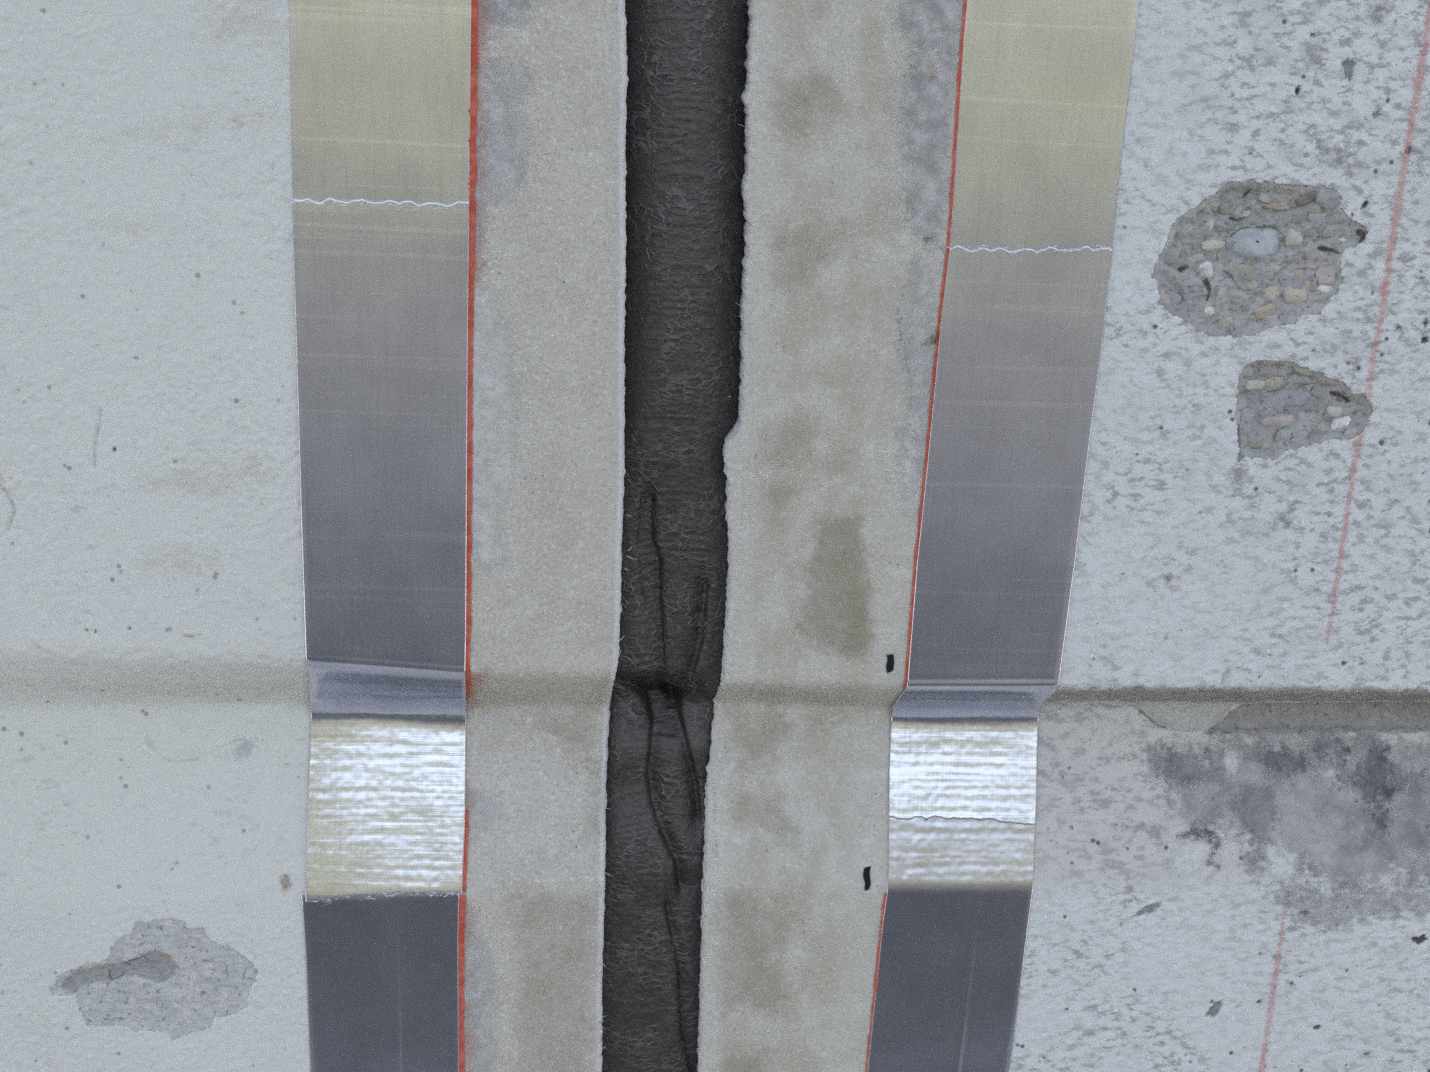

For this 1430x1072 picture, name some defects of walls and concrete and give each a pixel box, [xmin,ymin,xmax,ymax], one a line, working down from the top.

spalling [1151,179,1367,339]
spalling [1235,360,1373,462]
damp [1150,731,1430,930]
spalling [50,918,257,1040]